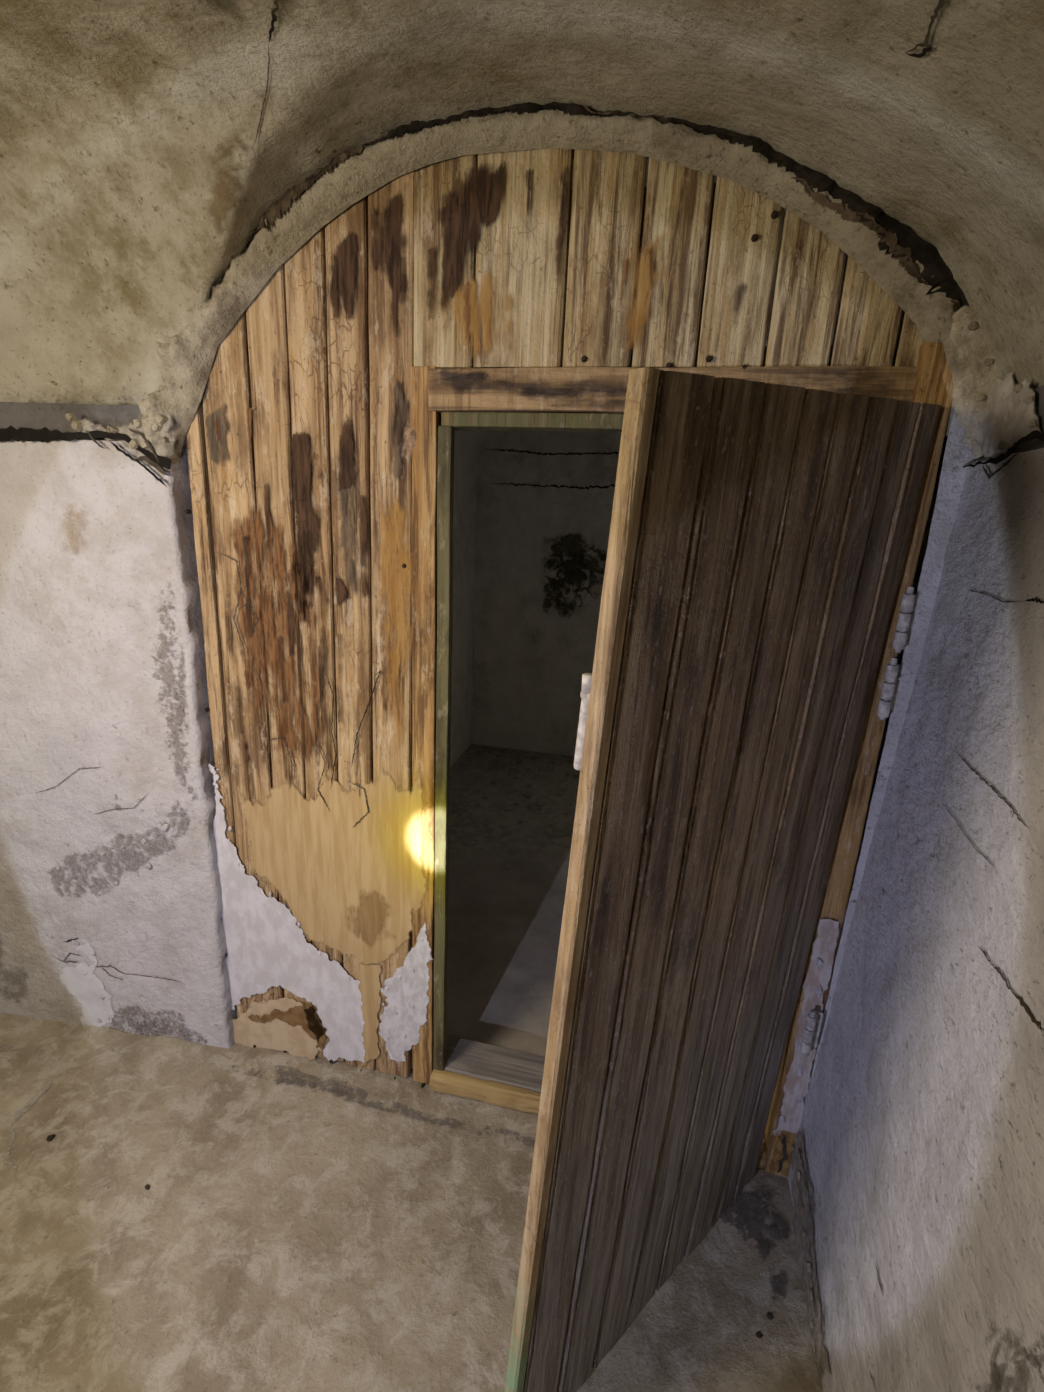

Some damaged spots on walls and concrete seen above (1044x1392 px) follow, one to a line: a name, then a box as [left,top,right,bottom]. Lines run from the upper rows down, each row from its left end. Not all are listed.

crack [255,0,279,142]
crack [575,104,671,119]
crack [906,0,945,58]
crack [306,141,372,180]
crack [209,223,260,298]
water stain [328,193,406,335]
crack [791,177,960,312]
spalling [65,406,176,475]
crack [963,430,1044,479]
mould [543,533,607,617]
water stain [225,416,426,1062]
peeling [208,764,432,1063]